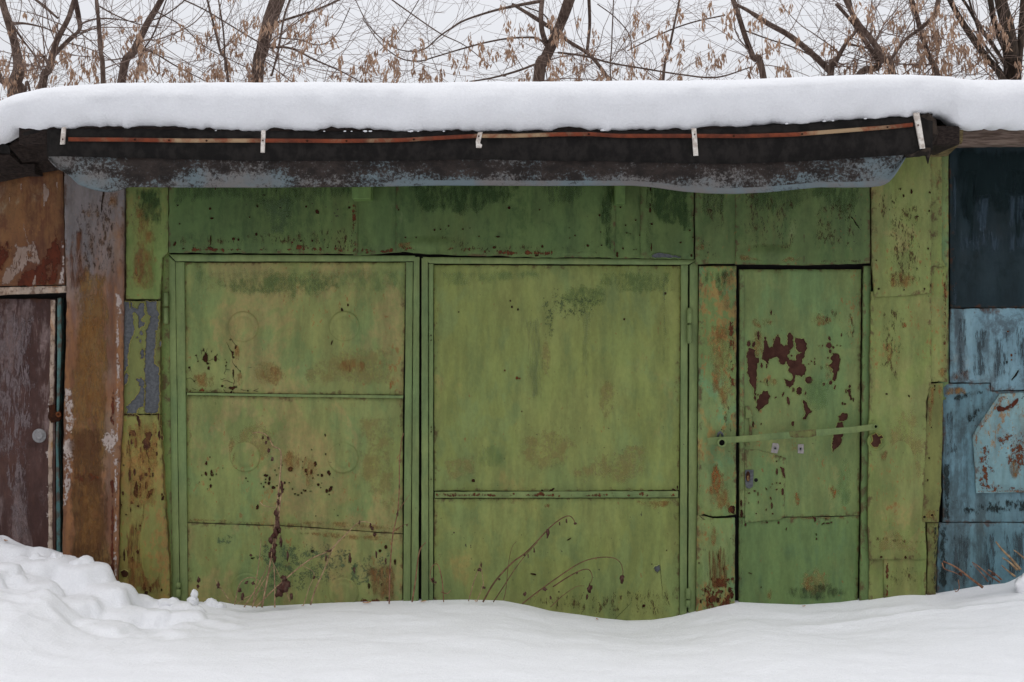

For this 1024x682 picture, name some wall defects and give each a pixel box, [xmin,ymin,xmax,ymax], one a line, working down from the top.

rust [879,195,920,286]
rust [18,197,116,572]
peeling [101,294,165,578]
rust [976,397,1024,492]
rust [702,530,742,609]